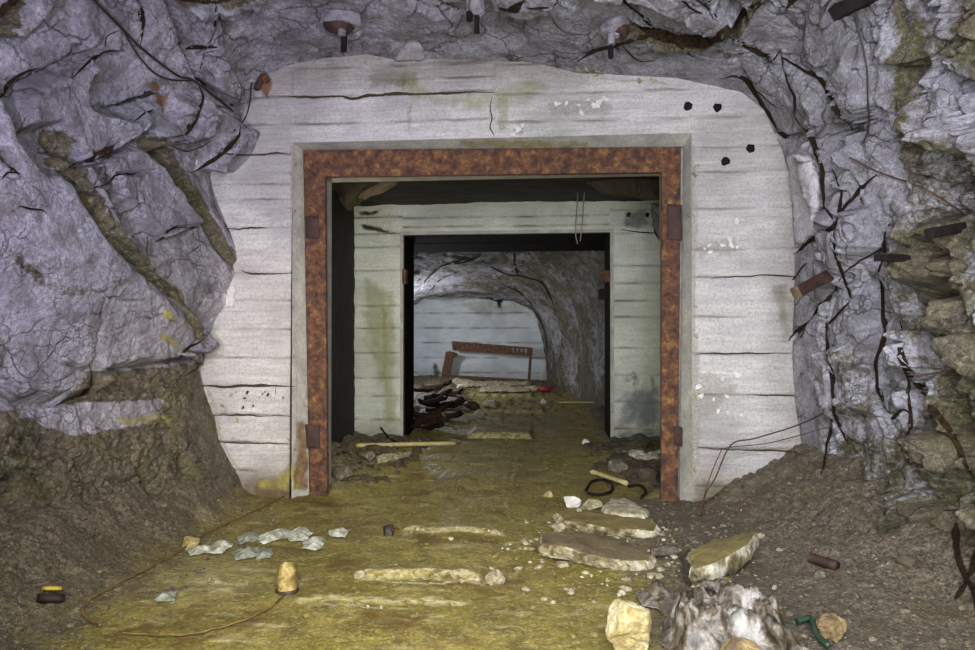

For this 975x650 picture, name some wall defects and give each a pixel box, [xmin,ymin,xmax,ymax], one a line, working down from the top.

crack [264,91,495,137]
corrosion [411,378,467,431]